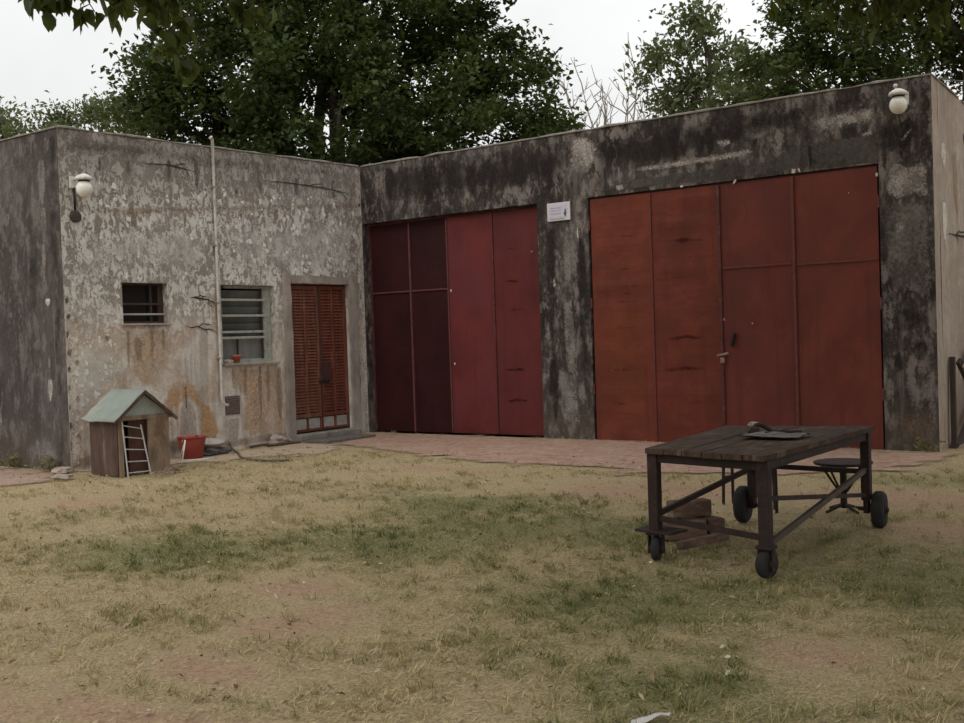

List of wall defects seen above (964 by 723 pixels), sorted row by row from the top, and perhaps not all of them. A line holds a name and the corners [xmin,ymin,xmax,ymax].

leakage [30,144,54,282]
peeling [80,182,209,317]
peeling [218,170,369,427]
leakage [385,145,560,201]
spalling [65,298,116,467]
rust [168,384,218,438]